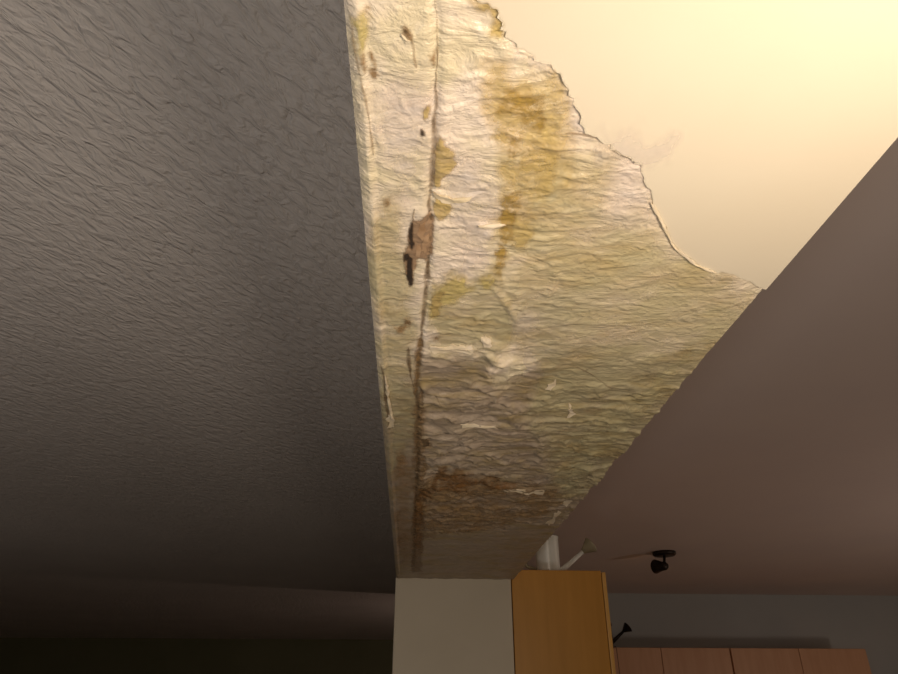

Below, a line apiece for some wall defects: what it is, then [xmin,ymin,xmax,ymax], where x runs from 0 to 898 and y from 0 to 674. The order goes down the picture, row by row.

water stain [479,4,502,37]
crack [413,43,438,220]
water stain [434,198,451,220]
water stain [434,139,456,187]
water stain [428,276,511,351]
peeling [344,0,762,580]
water stain [488,71,741,496]
crack [407,247,431,572]